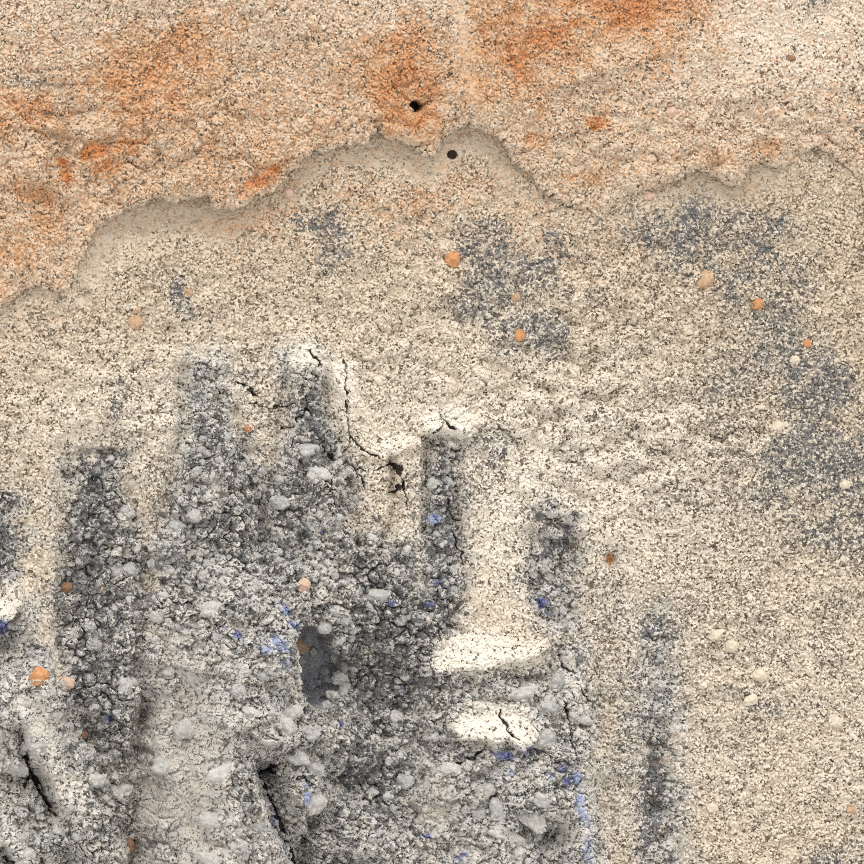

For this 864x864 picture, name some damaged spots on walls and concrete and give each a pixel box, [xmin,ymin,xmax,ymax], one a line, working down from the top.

rust [0,0,254,306]
rust [207,158,302,241]
rust [330,169,515,229]
peeling [0,0,864,307]
rust [334,0,747,154]
crack [236,381,313,429]
crack [322,360,409,504]
spalling [0,352,606,864]